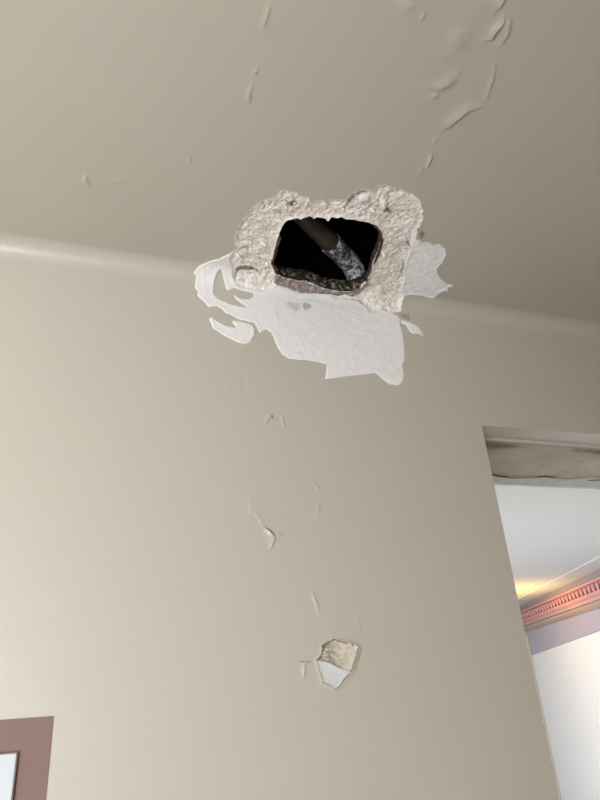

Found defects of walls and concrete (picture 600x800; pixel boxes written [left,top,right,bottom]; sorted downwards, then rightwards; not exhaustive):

peeling [194,184,453,386]
spalling [311,633,362,695]